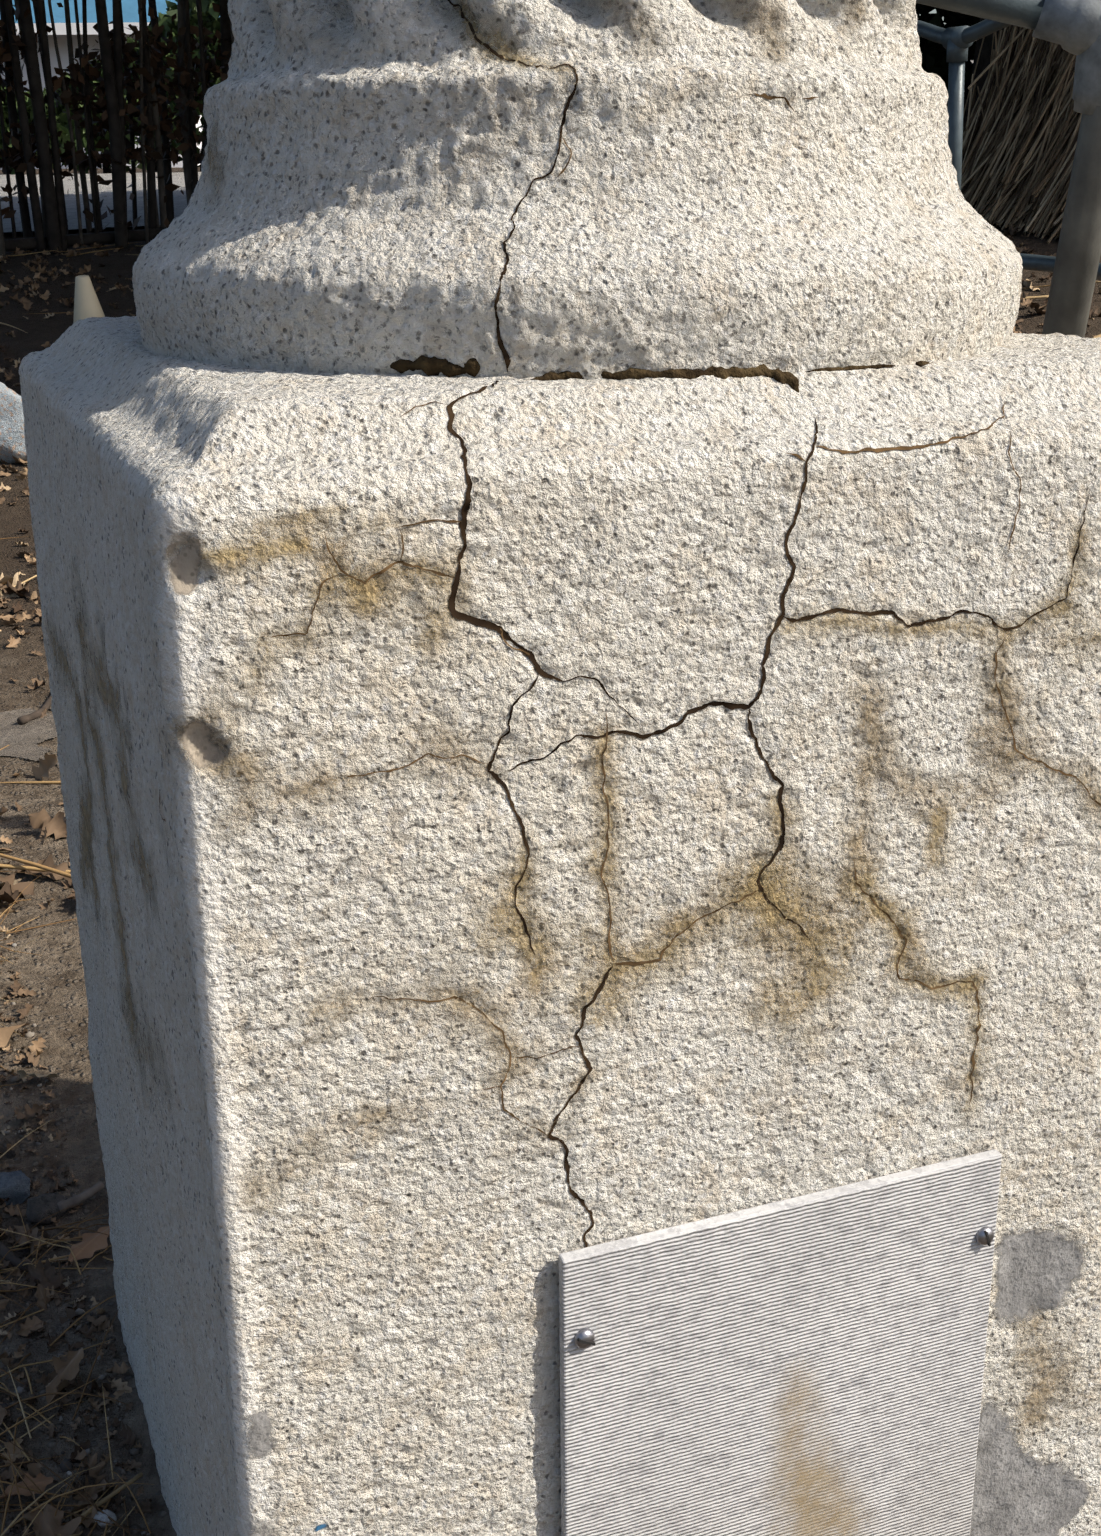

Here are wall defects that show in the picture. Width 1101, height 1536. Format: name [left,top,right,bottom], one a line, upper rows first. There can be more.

spalling [167,538,200,595]
crack [273,0,1101,1247]
water stain [989,640,1036,763]
water stain [843,830,870,887]